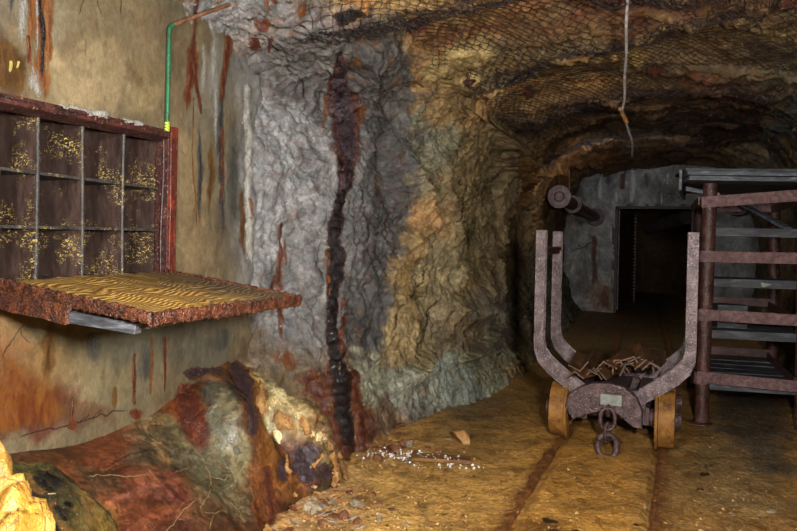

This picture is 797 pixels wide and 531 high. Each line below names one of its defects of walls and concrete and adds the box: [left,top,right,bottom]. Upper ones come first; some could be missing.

rust [0,0,84,115]
rust [184,0,202,223]
rust [166,34,368,526]
rust [0,362,77,430]
rust [130,354,142,420]
rust [150,337,167,394]